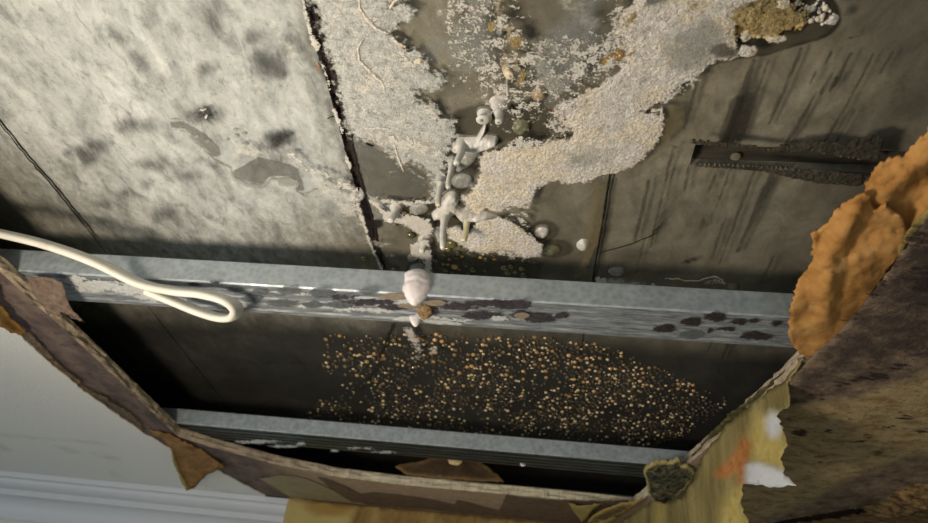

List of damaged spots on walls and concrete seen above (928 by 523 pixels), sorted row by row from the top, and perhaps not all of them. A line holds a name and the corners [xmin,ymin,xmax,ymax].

water stain [170,0,840,273]